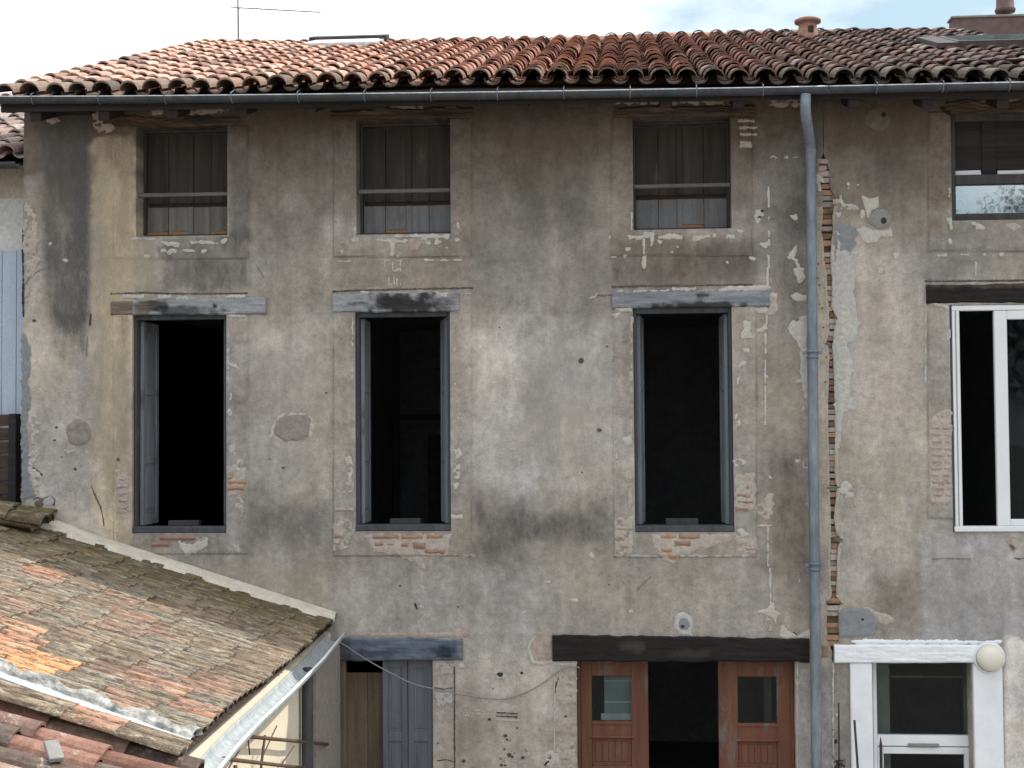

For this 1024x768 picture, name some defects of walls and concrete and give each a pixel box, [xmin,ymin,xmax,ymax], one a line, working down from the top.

leakage [45,119,88,325]
peeling [130,237,227,259]
peeling [612,308,634,459]
peeling [611,212,744,269]
peeling [787,245,807,301]
peeling [788,315,808,412]
crack [816,156,843,657]
peeling [833,182,893,452]
peeling [151,536,208,556]
flaking render [332,508,475,570]
flaking render [614,459,810,639]
peeling [839,607,1002,645]